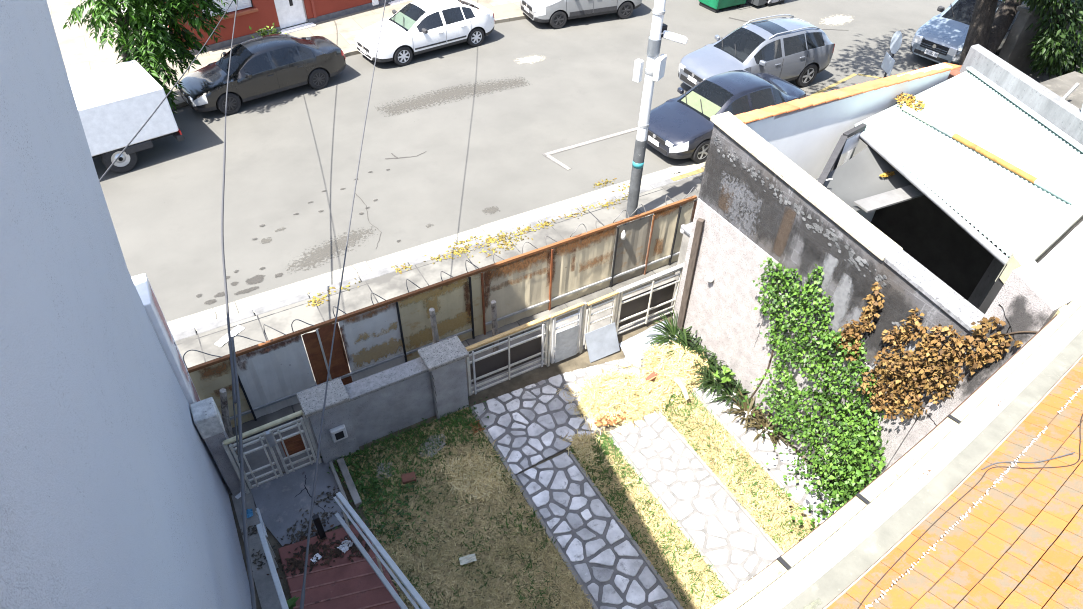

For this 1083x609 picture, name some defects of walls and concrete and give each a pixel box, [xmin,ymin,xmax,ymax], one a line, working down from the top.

rust [484,228,615,307]
water stain [702,144,923,389]
rust [339,278,471,368]